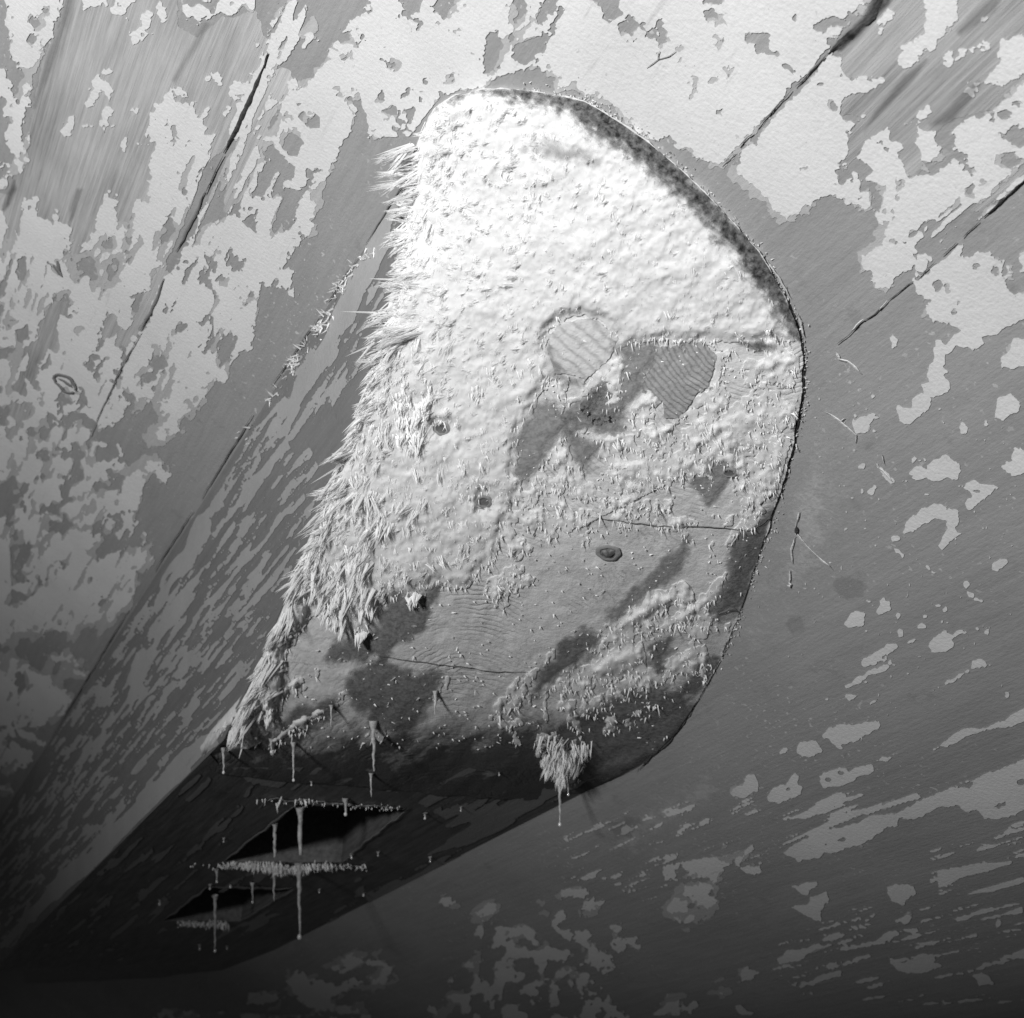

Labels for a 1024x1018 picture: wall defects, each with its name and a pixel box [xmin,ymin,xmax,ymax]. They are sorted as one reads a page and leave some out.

crack [836,282,911,373]
peeling [984,393,1020,426]
peeling [1001,337,1024,369]
peeling [271,448,318,505]
leakage [761,436,849,590]
peeling [844,583,990,701]
peeling [779,711,888,757]
peeling [933,709,1024,751]
peeling [327,768,588,923]
peeling [730,756,1024,895]
peeling [427,802,767,1018]
peeling [653,877,1024,1016]